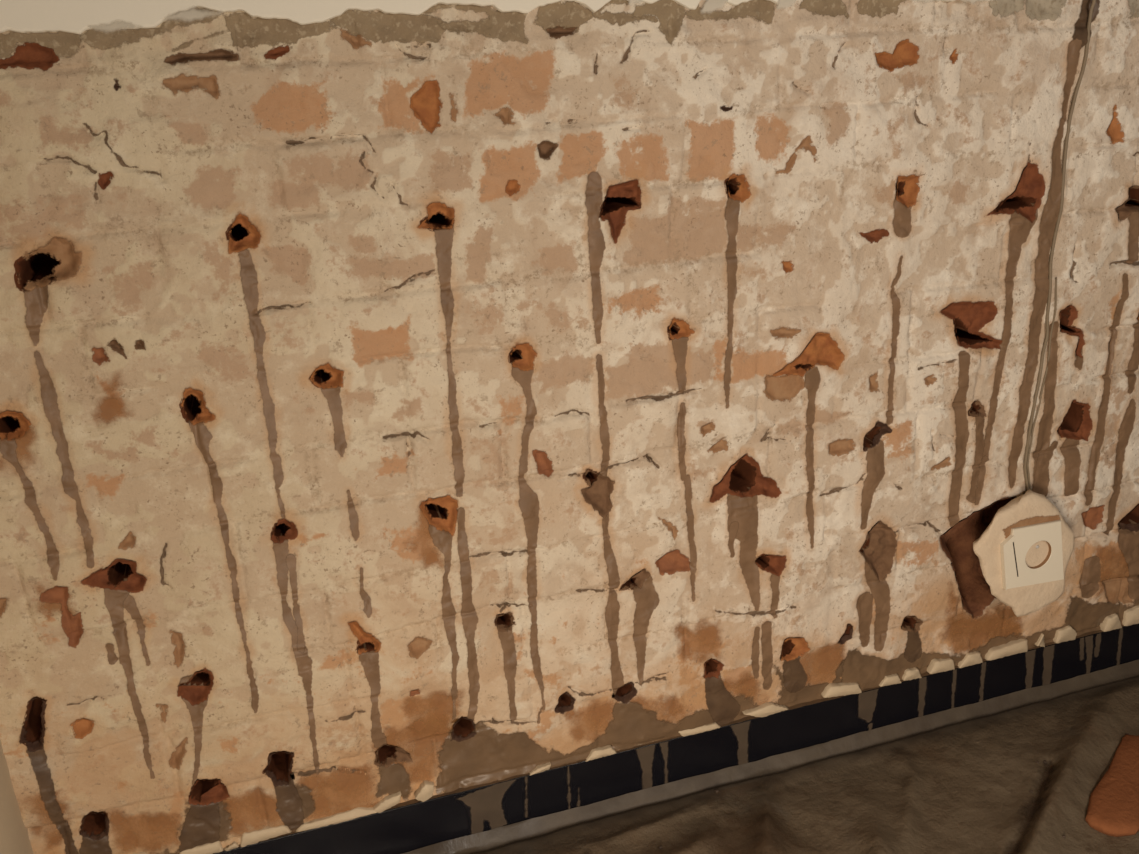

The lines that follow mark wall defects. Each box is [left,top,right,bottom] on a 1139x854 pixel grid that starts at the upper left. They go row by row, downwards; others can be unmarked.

spalling [0,0,775,99]
crack [44,123,162,200]
spalling [601,180,641,244]
damp [24,266,94,568]
damp [238,249,285,518]
spalling [763,327,845,402]
damp [727,0,1139,731]
spalling [941,301,1002,349]
damp [347,490,360,541]
damp [359,172,759,834]
spalling [710,454,781,503]
spalling [940,497,1016,619]